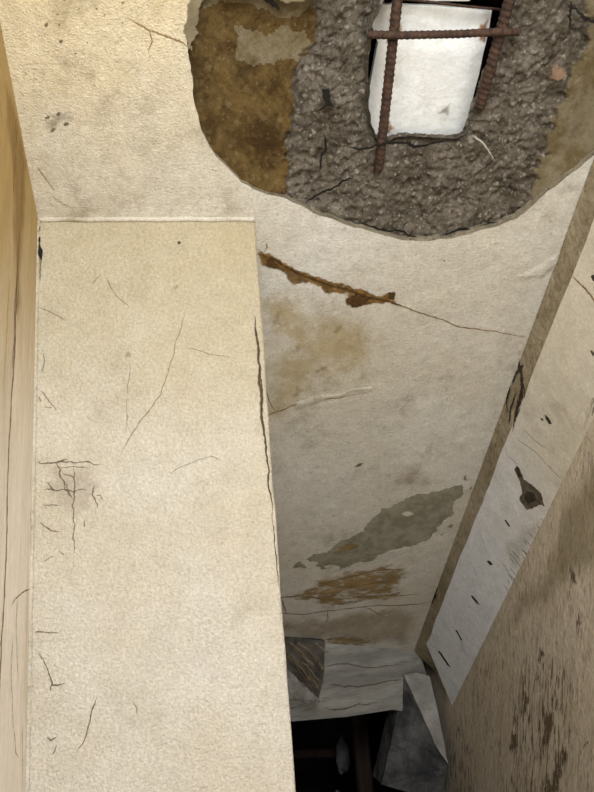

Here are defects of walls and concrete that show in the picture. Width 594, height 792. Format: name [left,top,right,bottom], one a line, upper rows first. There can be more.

spalling [183,0,594,237]
rust [257,243,407,309]
crack [396,303,525,337]
crack [30,459,103,562]
crack [255,318,427,622]
peeling [292,475,472,572]
peeling [515,466,544,510]